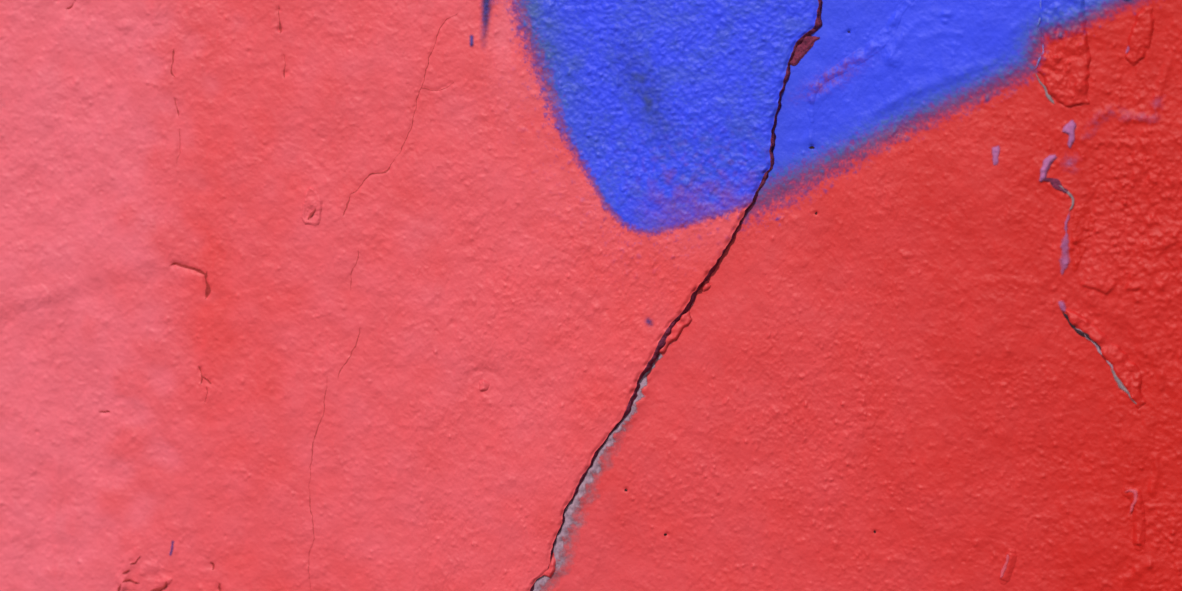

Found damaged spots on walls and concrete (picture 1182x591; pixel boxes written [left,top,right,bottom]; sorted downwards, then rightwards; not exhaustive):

crack [530,0,823,591]